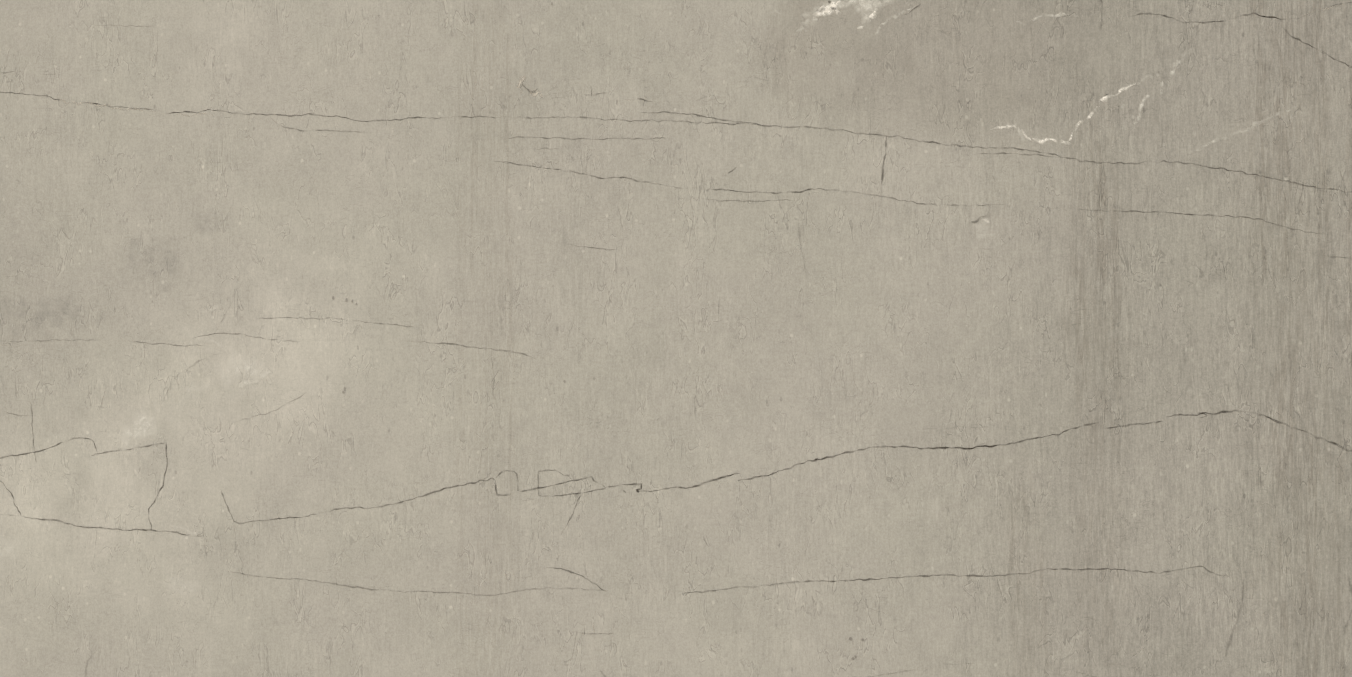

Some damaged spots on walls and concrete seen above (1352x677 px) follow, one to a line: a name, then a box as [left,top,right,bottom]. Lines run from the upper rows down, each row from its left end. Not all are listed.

crack [920,443,997,451]
damp [749,0,1352,677]